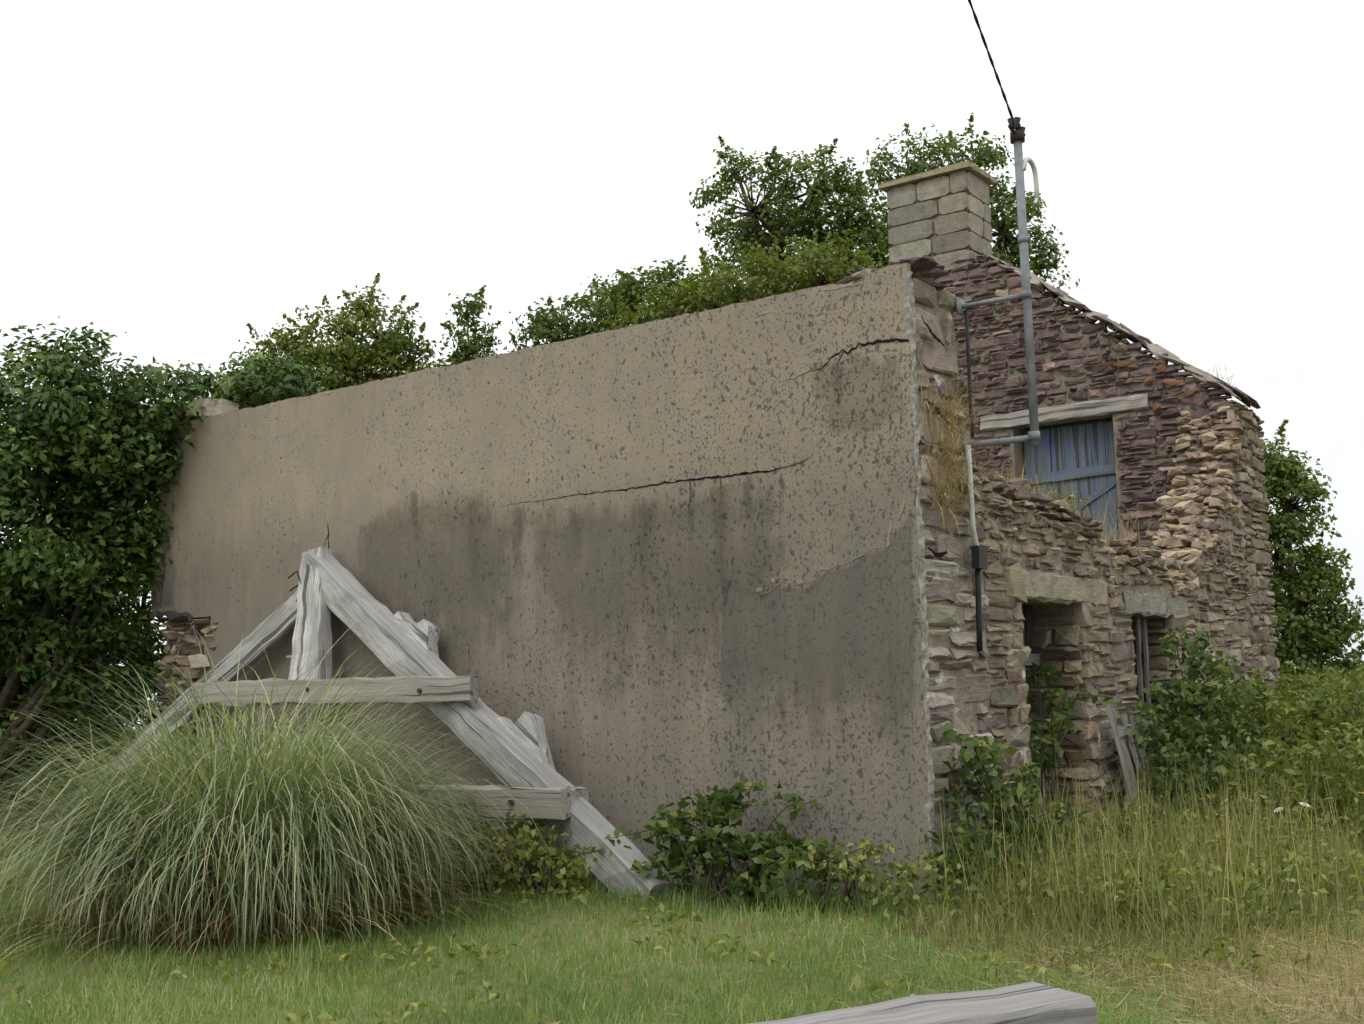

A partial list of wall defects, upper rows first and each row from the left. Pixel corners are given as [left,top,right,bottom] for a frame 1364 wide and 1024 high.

crack [778,315,947,382]
crack [500,456,811,523]
damp [364,497,522,635]
damp [541,489,769,658]